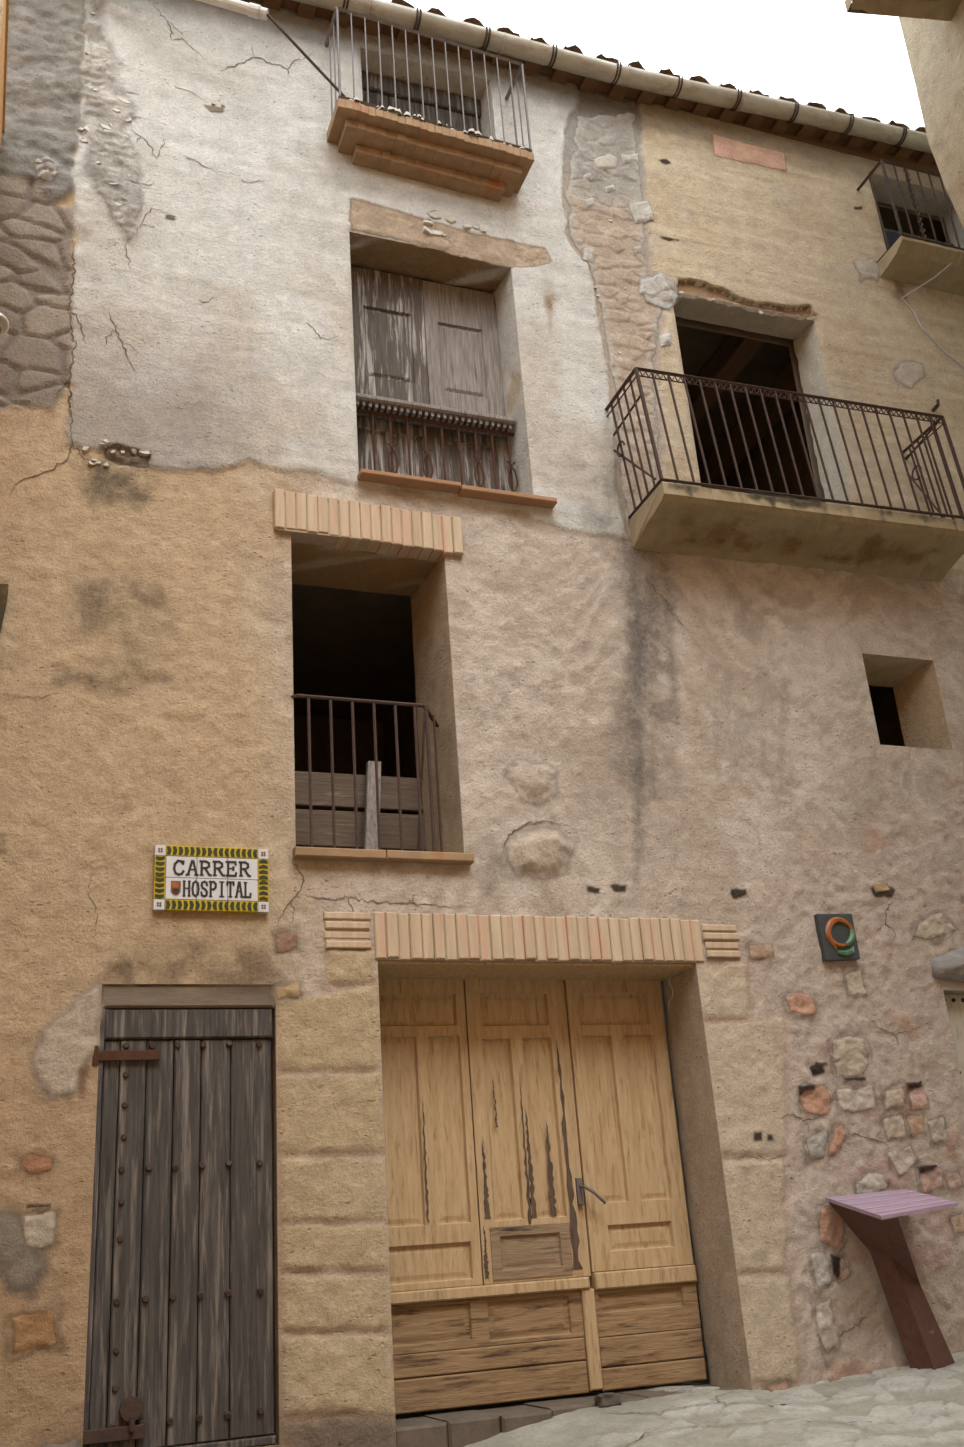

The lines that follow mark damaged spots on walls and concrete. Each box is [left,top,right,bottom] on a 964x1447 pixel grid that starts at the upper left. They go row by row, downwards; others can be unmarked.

spalling [34,156,59,180]
flaking render [75,0,143,239]
crack [10,240,135,493]
spalling [564,112,685,524]
water stain [749,493,821,507]
crack [278,853,461,923]